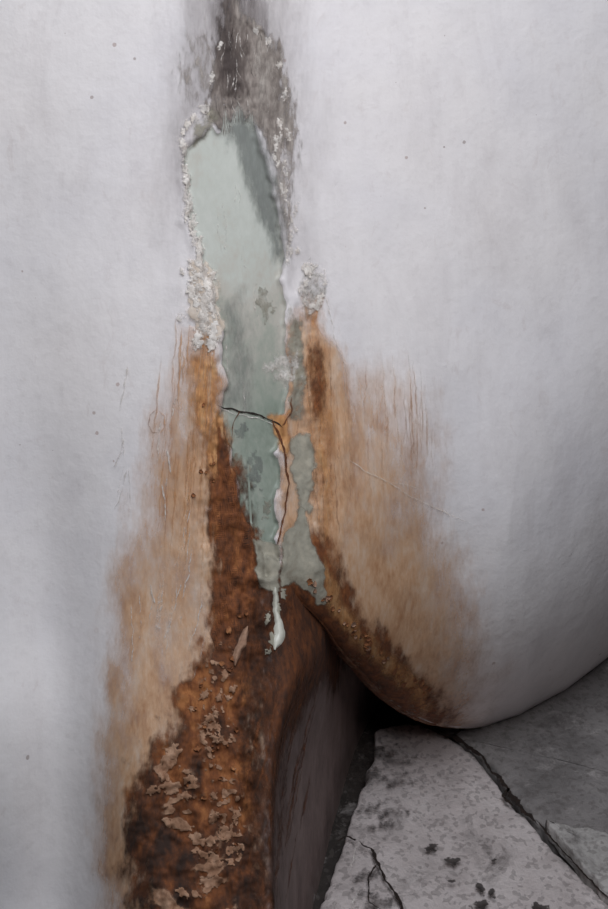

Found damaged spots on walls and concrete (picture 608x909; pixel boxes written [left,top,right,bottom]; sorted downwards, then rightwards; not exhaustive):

rust [99,331,289,909]
peeling [177,0,302,544]
crack [218,398,293,544]
crack [337,836,403,909]
rust [280,310,469,728]
crack [432,726,608,898]